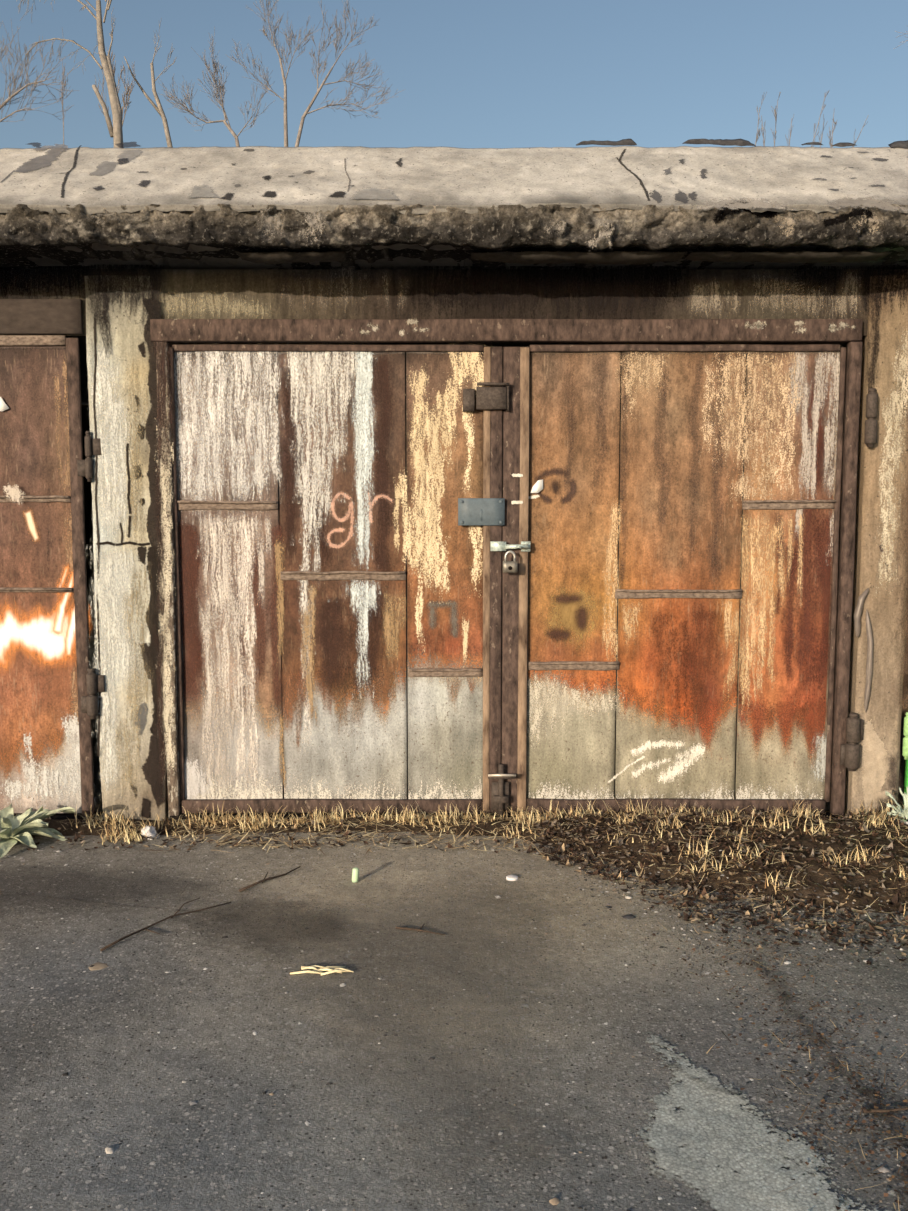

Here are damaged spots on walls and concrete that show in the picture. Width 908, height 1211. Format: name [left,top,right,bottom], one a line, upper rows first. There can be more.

crack [61,145,82,198]
spalling [254,175,354,244]
spalling [587,212,618,250]
crack [616,149,650,201]
spalling [777,211,804,237]
spalling [850,212,885,235]
rust [0,347,74,621]
peeling [392,343,484,649]
rust [153,341,484,784]
rust [528,352,838,759]
rust [0,644,79,775]
peeling [190,772,482,799]